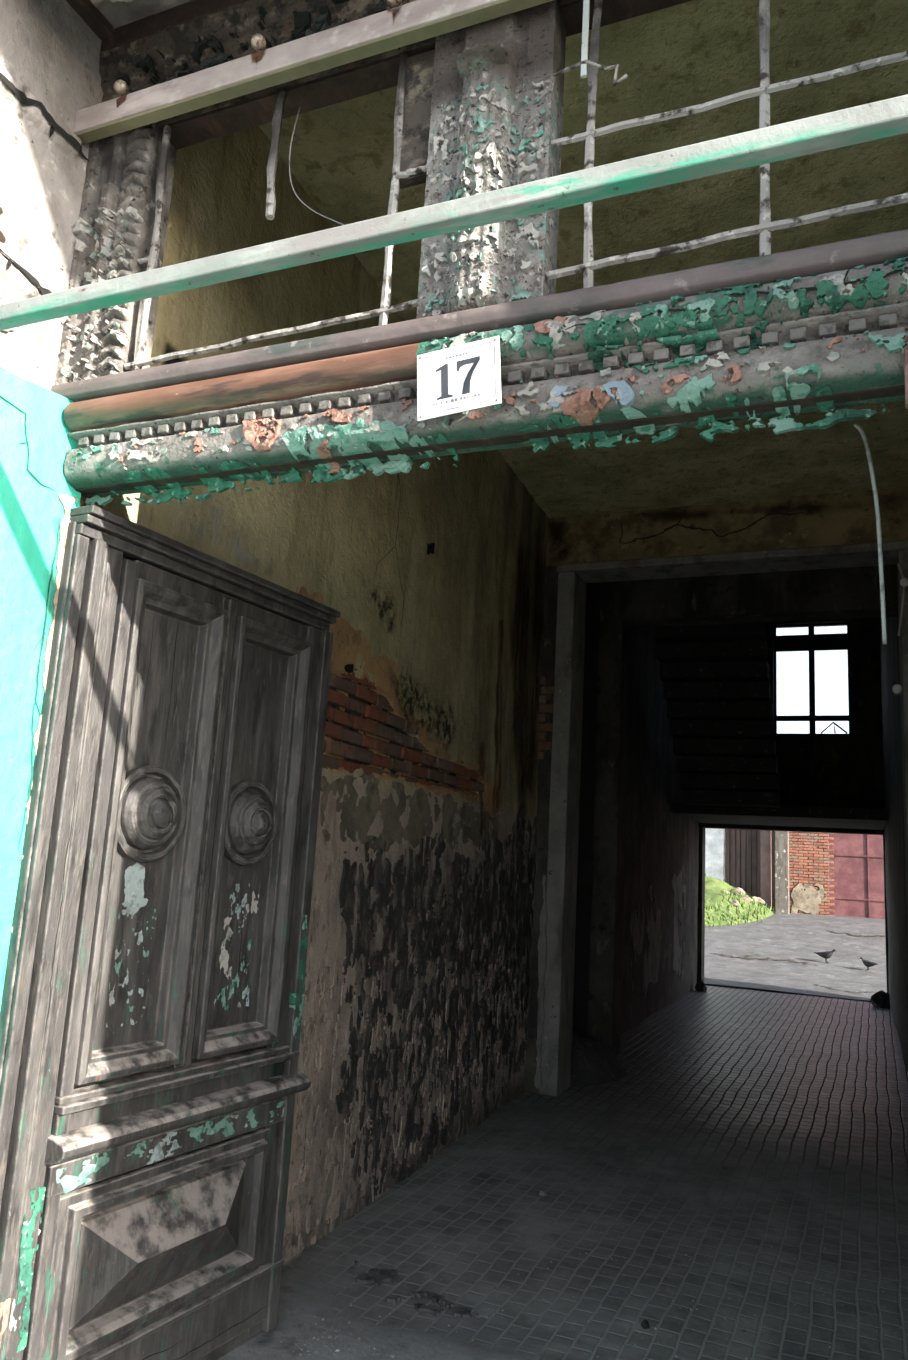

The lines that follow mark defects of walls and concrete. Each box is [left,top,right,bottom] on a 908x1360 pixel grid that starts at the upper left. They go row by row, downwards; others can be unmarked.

peeling [114,0,405,93]
peeling [424,81,548,206]
crack [0,249,52,295]
peeling [71,206,144,288]
peeling [422,212,545,317]
peeling [42,256,908,693]
crack [0,395,60,844]
spalling [33,715,42,756]
peeling [106,862,156,1028]
peeling [127,616,548,1267]
peeling [0,1152,110,1359]
spalling [350,1260,479,1319]